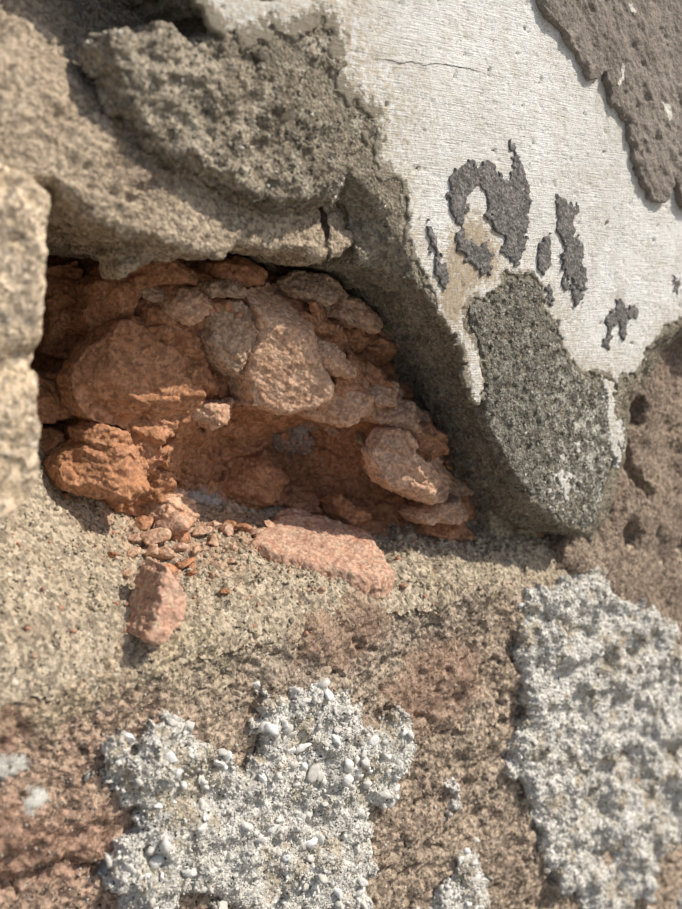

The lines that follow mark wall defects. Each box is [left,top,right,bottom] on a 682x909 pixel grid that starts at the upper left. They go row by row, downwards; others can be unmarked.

spalling [29,255,477,541]